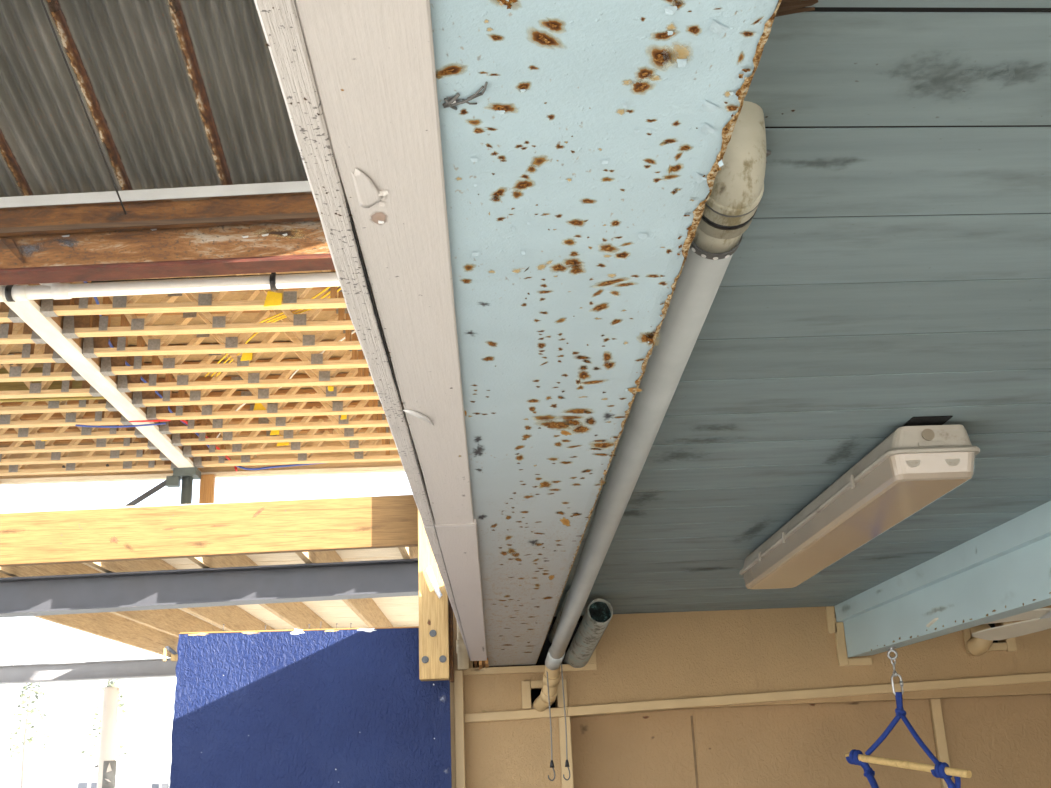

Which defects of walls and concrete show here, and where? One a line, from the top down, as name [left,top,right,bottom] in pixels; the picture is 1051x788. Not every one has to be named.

rust [0,128,33,196]
rust [46,0,133,191]
rust [168,0,233,185]
rust [436,65,463,79]
rust [460,109,505,162]
rust [489,0,782,663]